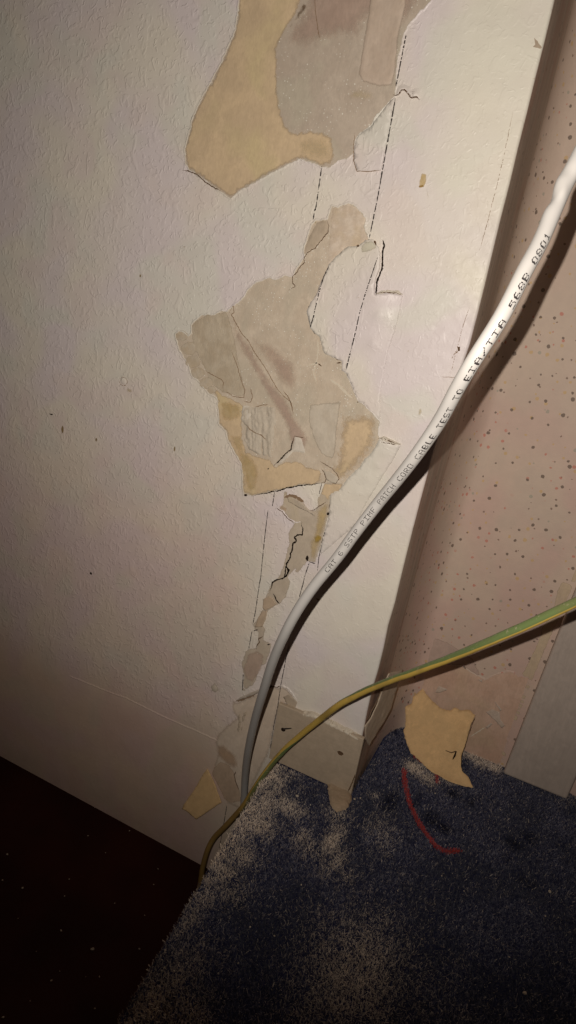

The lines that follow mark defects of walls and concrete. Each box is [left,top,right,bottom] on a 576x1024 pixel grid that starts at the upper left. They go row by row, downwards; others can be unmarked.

crack [375,241,403,295]
crack [244,427,330,603]
peeling [255,596,276,627]
peeling [212,684,297,807]